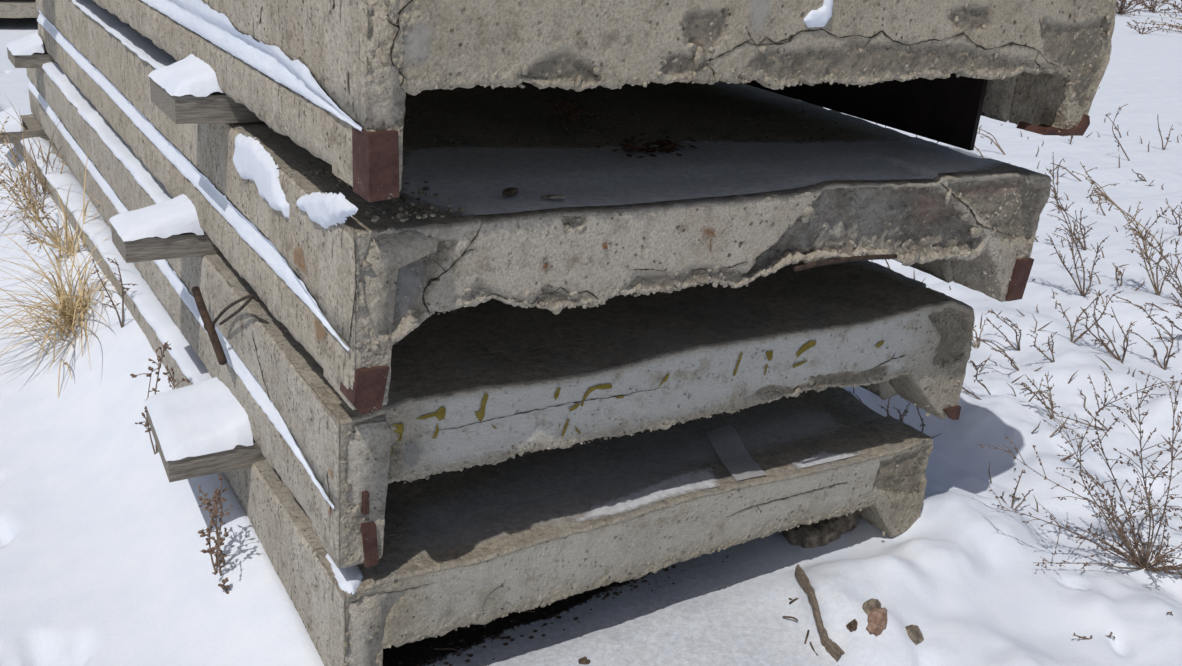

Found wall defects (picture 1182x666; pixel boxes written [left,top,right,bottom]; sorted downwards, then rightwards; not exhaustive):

crack [387,0,413,86]
crack [693,27,1067,73]
crack [940,183,1016,238]
crack [422,220,482,315]
corrosion [191,286,254,365]